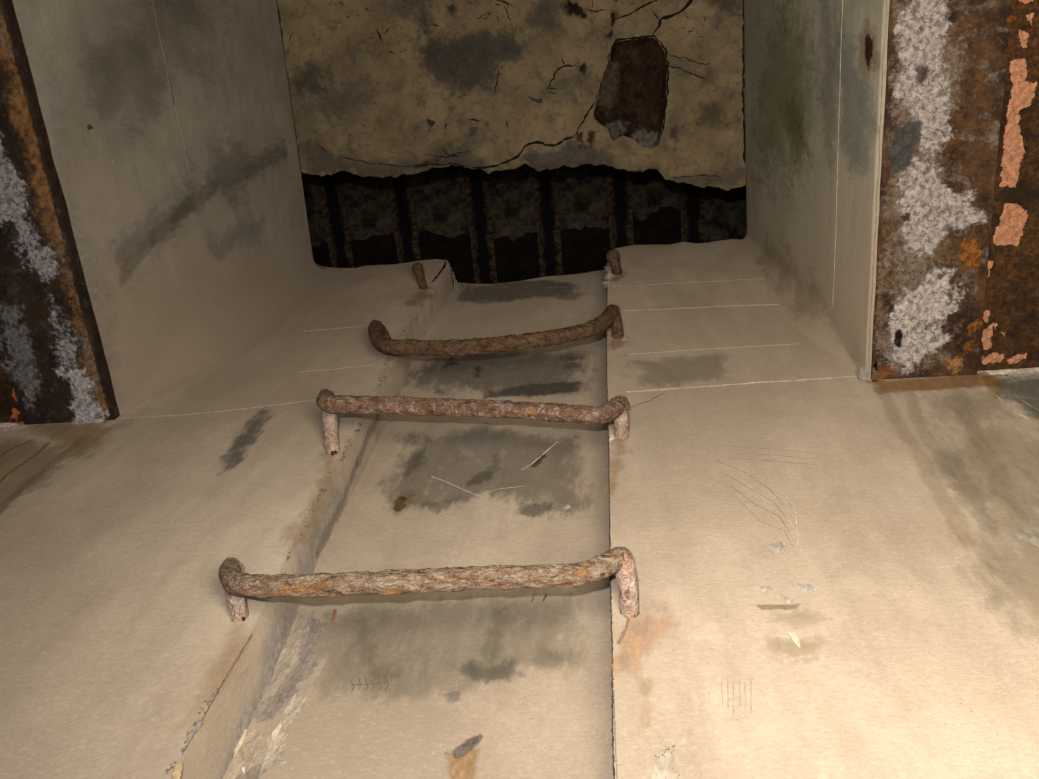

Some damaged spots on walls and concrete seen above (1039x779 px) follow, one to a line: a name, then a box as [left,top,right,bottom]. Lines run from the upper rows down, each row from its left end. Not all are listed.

crack [419,0,712,170]
spalling [592,12,677,151]
crack [740,0,748,164]
peeling [999,0,1037,188]
peeling [991,203,1028,246]
peeling [977,310,1039,376]
water stain [228,411,265,467]